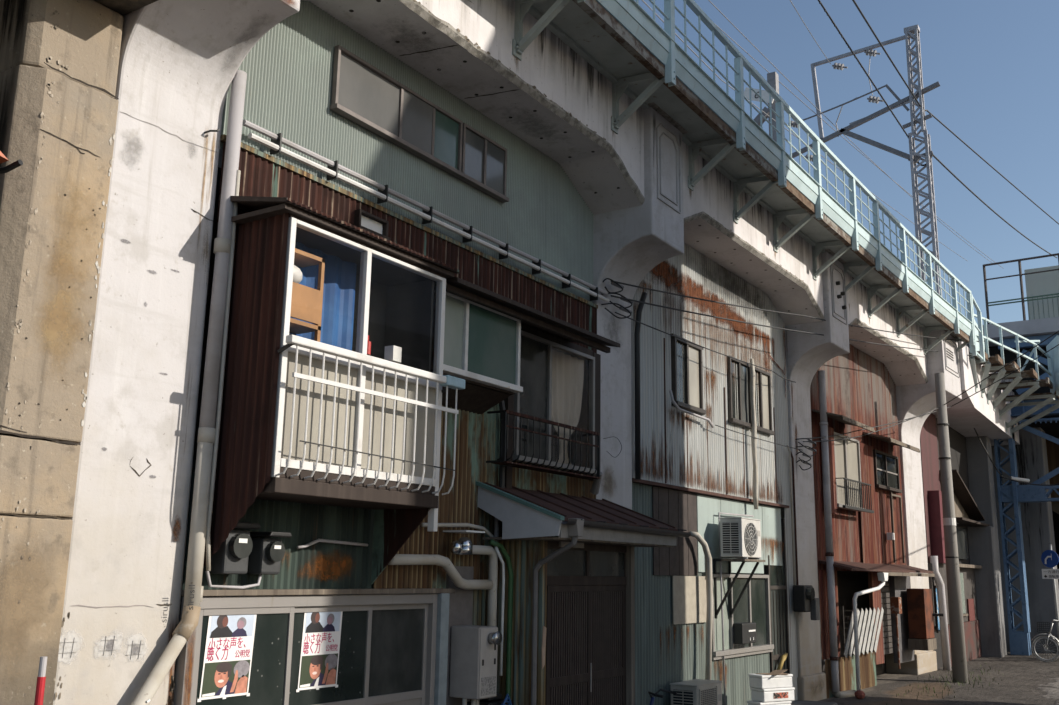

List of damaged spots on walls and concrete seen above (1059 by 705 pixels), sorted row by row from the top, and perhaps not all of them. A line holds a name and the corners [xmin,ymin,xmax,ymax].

damp [0,0,25,48]
damp [558,38,602,96]
damp [0,88,8,153]
crack [41,129,100,157]
crack [44,62,215,152]
corrosion [638,261,798,467]
corrosion [641,439,782,502]